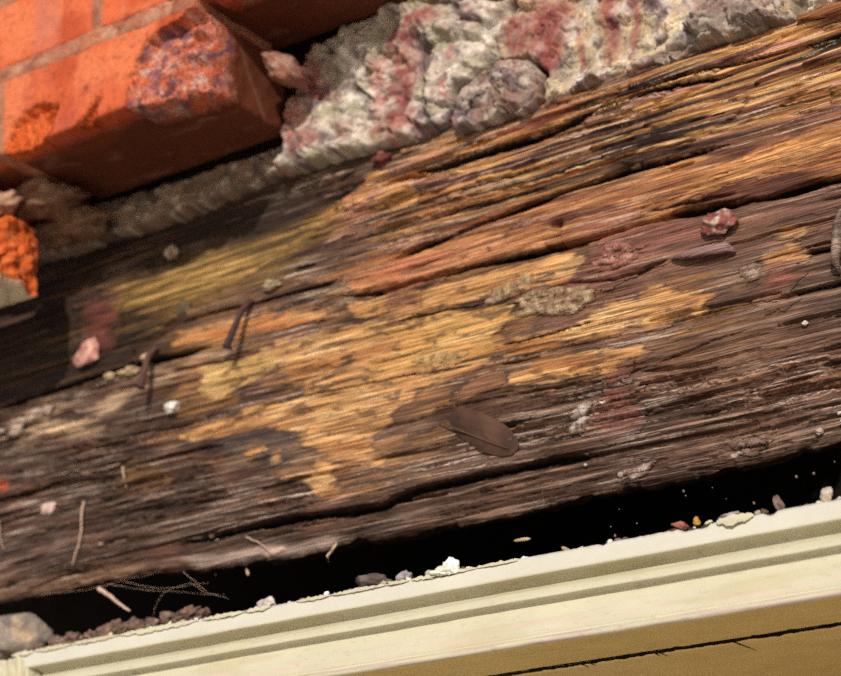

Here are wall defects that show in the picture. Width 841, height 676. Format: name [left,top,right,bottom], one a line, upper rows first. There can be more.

spalling [214,0,275,15]
spalling [124,7,241,128]
spalling [4,100,59,161]
crack [180,450,609,544]
crack [500,623,841,676]